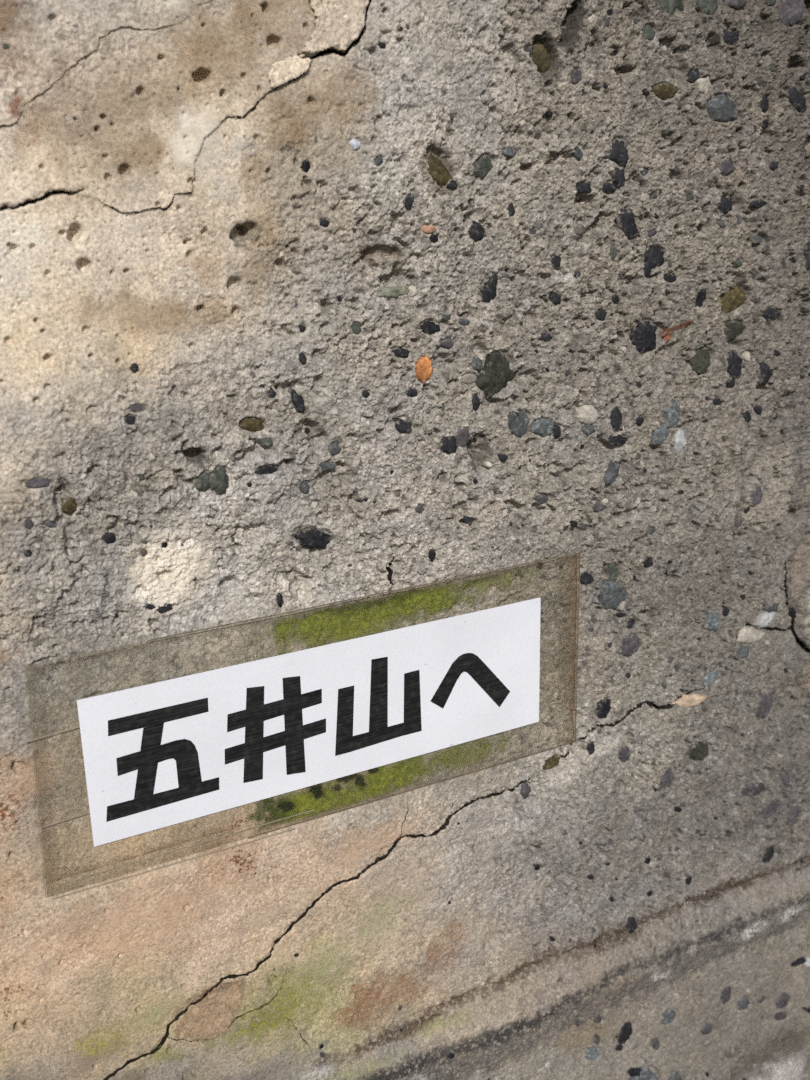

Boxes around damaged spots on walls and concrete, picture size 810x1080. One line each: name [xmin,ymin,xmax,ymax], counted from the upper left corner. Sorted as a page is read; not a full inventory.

crack [0,0,371,214]
peeling [269,0,369,88]
corrosion [0,753,28,830]
crack [104,562,810,1080]